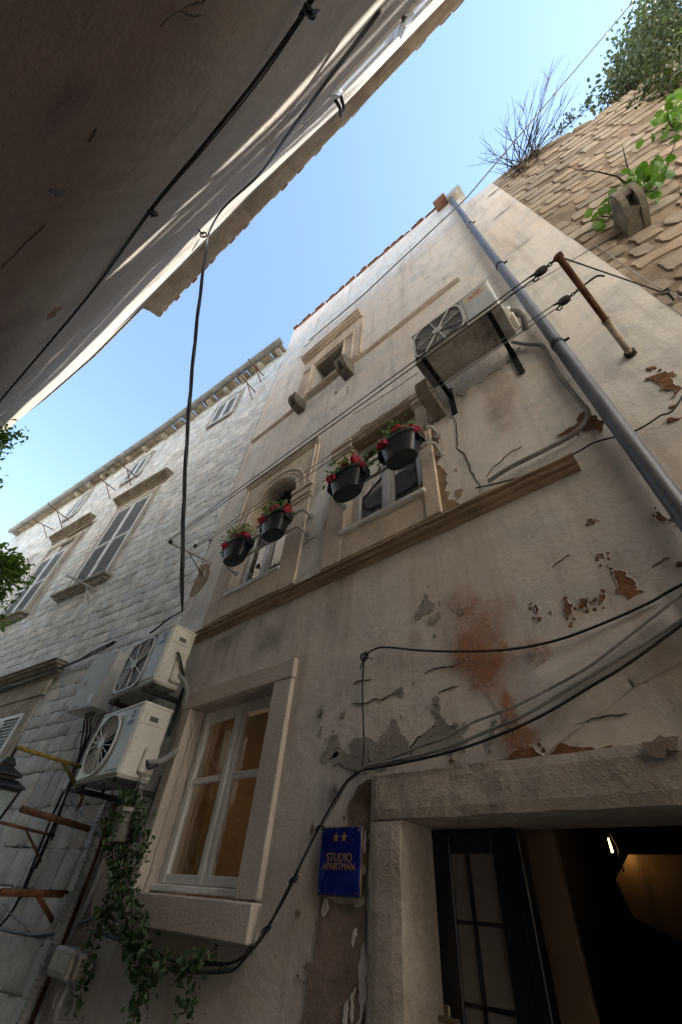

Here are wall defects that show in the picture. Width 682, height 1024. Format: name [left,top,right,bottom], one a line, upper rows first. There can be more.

peeling [557,405,605,438]
peeling [645,366,682,423]
peeling [429,420,464,512]
crack [451,417,522,491]
peeling [414,585,465,638]
flaking render [529,552,645,628]
crack [353,679,394,704]
rust [456,599,533,754]
flaking render [498,743,612,760]
crack [575,713,627,725]
spalling [642,735,679,759]
peeling [296,695,469,1024]